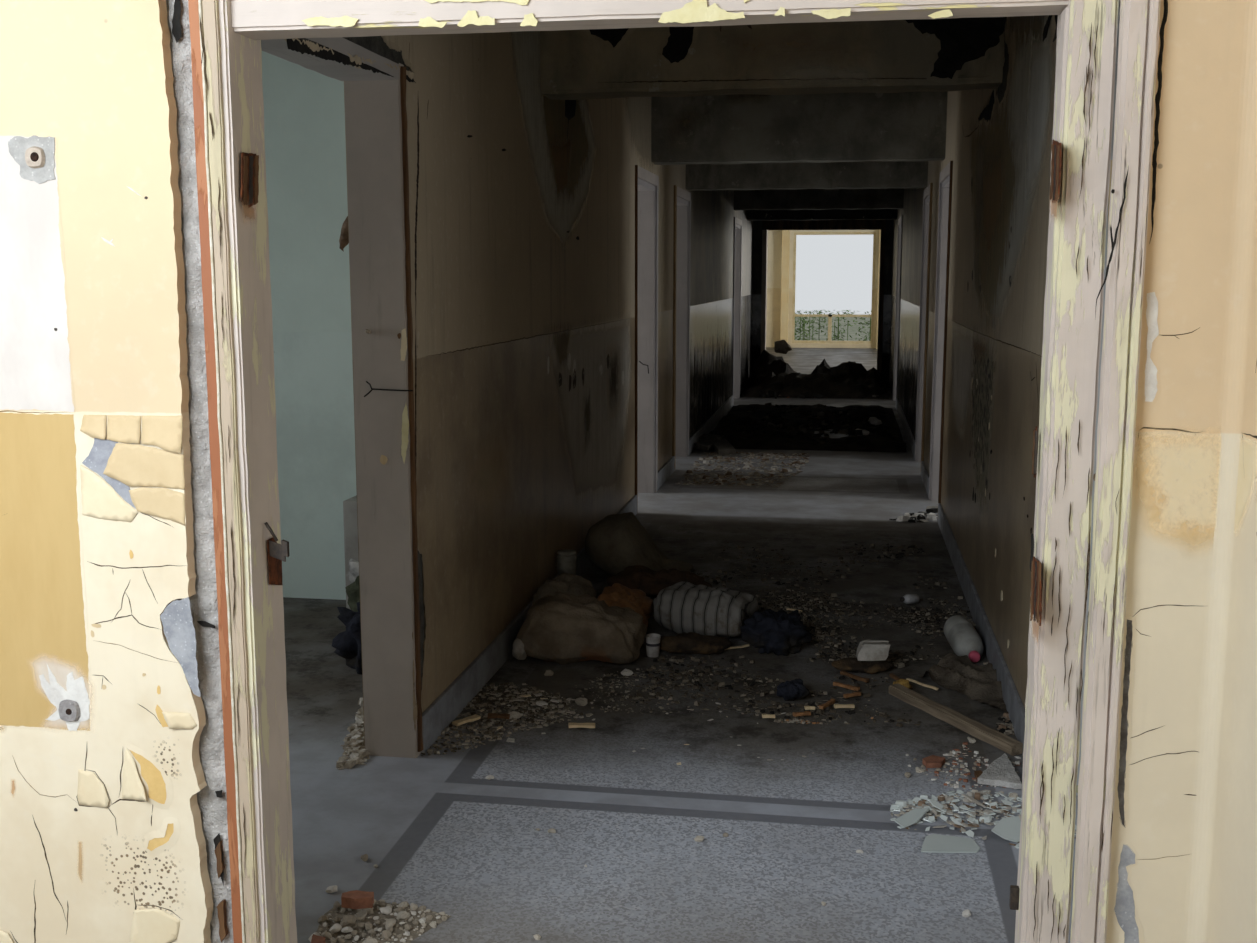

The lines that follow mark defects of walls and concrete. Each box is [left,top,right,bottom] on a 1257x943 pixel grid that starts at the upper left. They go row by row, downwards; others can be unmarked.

peeling [419,0,538,28]
spalling [583,28,636,52]
spalling [657,0,749,67]
peeling [811,8,851,19]
spalling [898,9,1011,125]
flaking render [0,0,234,943]
damp [1142,442,1219,540]
crack [87,561,188,663]
flaking render [1110,616,1145,943]
crack [11,750,153,943]
crack [133,889,180,943]